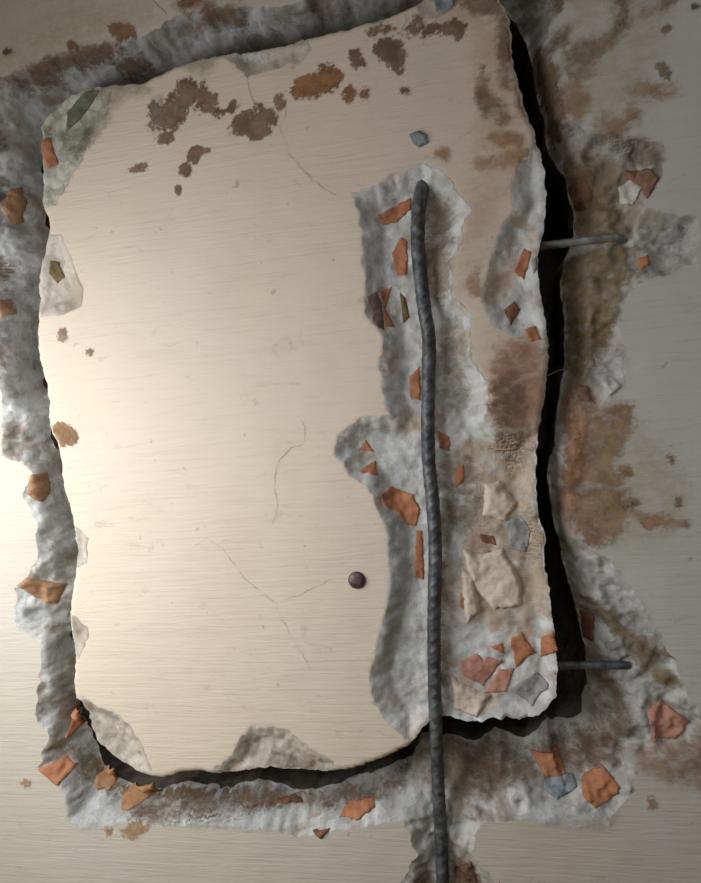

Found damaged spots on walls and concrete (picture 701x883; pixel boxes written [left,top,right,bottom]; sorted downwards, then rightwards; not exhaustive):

damp [456,0,525,125]
damp [550,0,628,77]
damp [655,62,672,80]
spalling [0,0,457,883]
spalling [334,0,701,883]
rust [556,392,688,546]